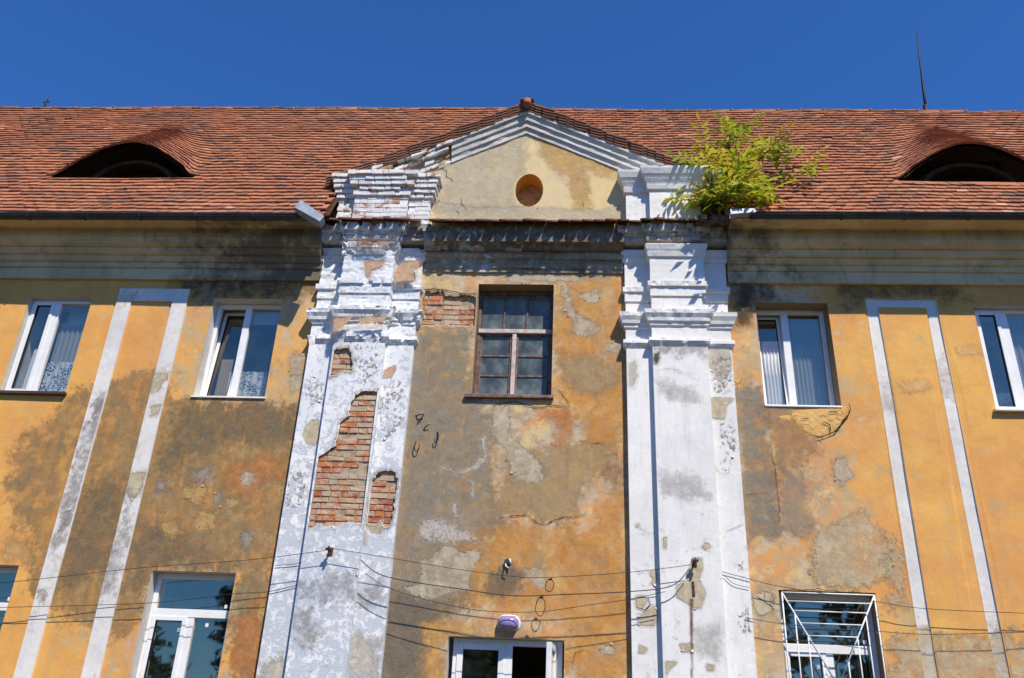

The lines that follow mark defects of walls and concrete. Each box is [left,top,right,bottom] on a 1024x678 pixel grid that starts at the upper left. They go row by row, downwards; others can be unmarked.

peeling [364,260,384,277]
peeling [395,260,420,282]
spalling [419,290,477,328]
spalling [286,316,403,545]
peeling [491,405,548,484]
water stain [735,385,817,542]
water stain [3,370,299,678]
crack [501,514,583,525]
peeling [404,545,482,601]
peeling [677,541,710,609]
peeling [807,508,907,614]
peeling [886,625,1024,678]